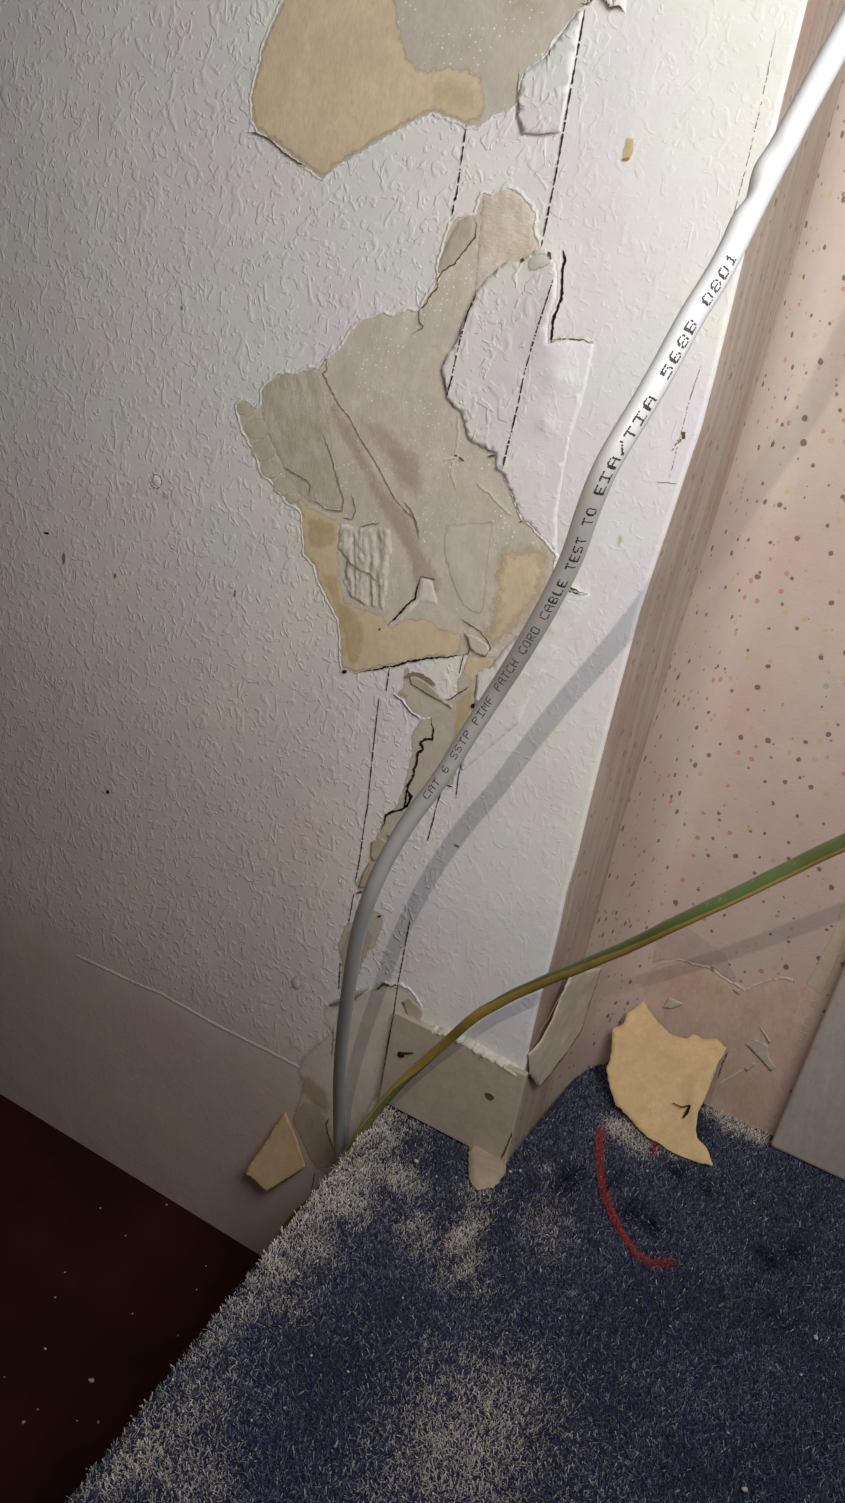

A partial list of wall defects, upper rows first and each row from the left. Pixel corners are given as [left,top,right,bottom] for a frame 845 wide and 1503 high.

crack [550,250,594,343]
crack [379,576,436,630]
flaking render [397,578,438,620]
crack [342,653,476,838]
peeling [358,838,386,888]
peeling [293,980,424,1174]